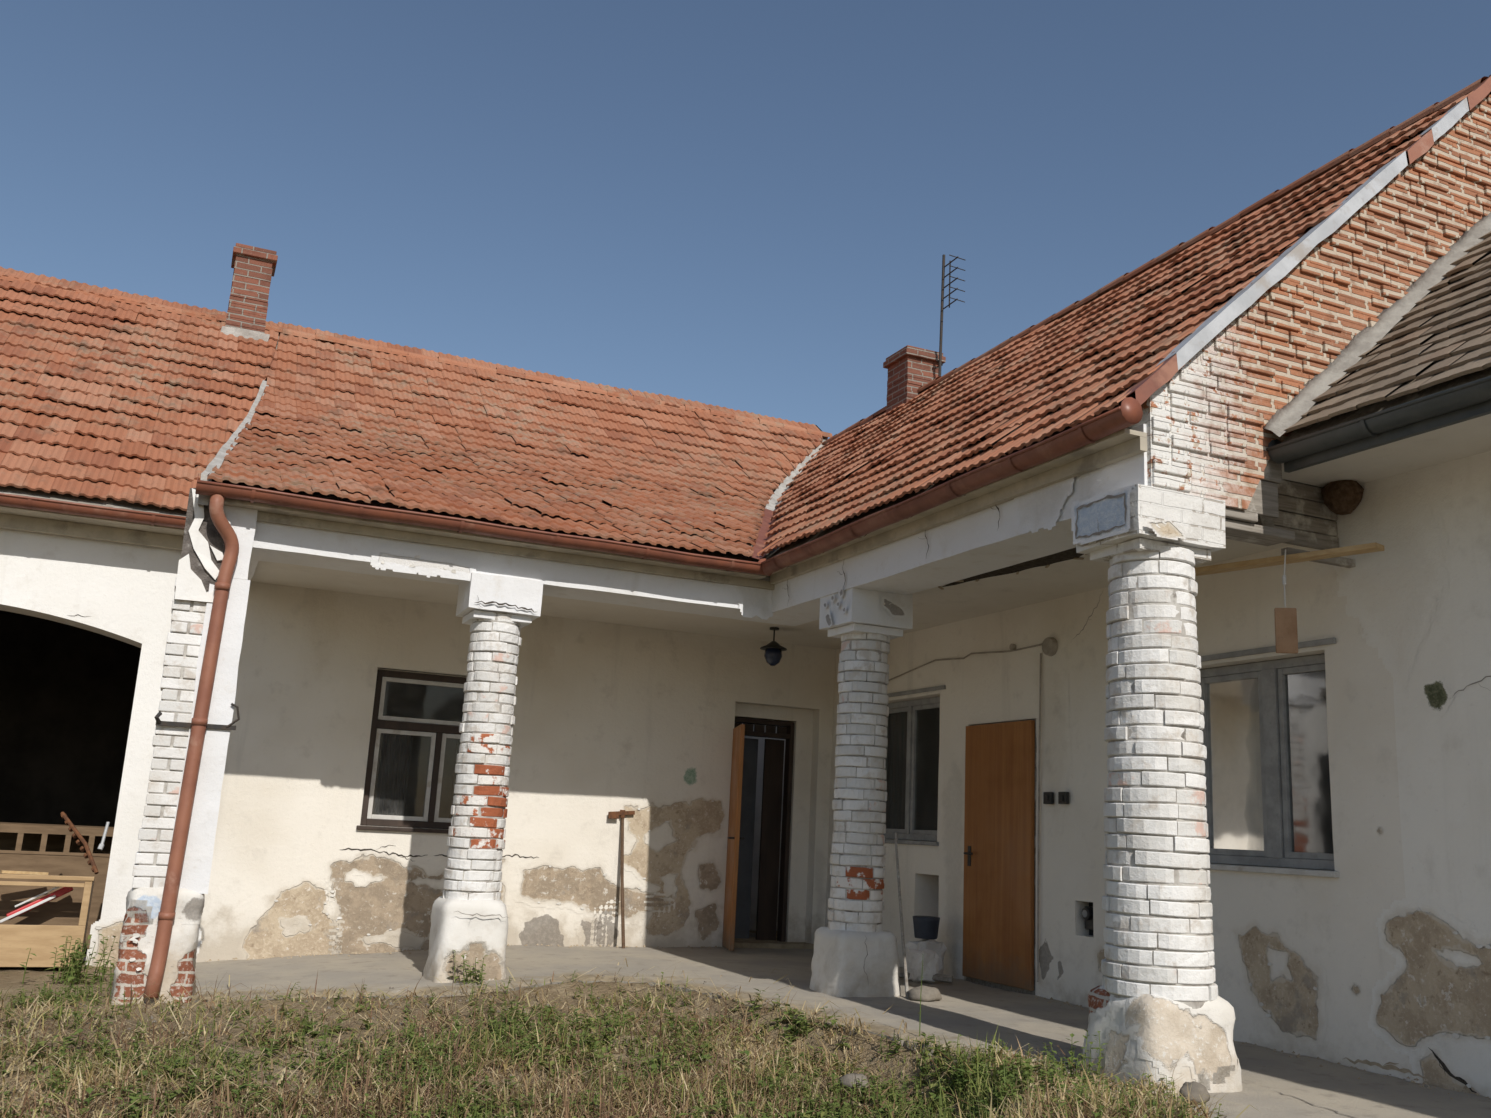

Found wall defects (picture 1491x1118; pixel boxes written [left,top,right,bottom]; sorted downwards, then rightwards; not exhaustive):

spalling [86,894,205,1005]
peeling [235,847,447,960]
peeling [452,734,729,947]
flaking render [836,866,885,900]
peeling [1088,940,1235,1084]
peeling [1228,916,1328,1049]
peeling [1350,898,1491,1098]